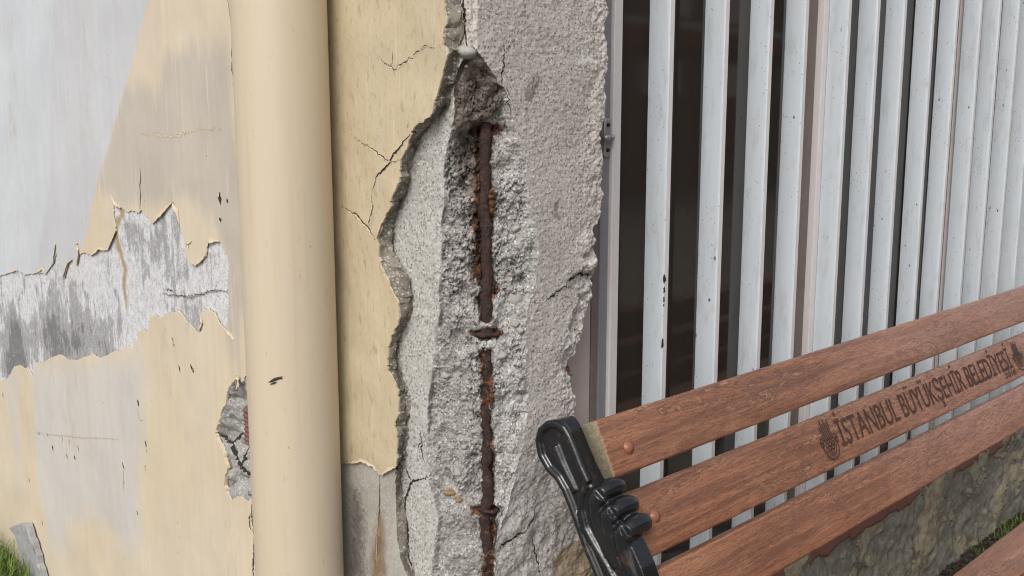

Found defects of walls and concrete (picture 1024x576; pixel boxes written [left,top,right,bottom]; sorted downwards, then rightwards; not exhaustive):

crack [380,45,435,72]
crack [341,134,410,241]
peeling [0,195,235,396]
spalling [426,45,540,576]
corrosion [465,122,505,576]
crack [546,269,592,300]
flaking render [561,246,598,395]
flaking render [218,372,252,501]
peeling [341,458,415,576]